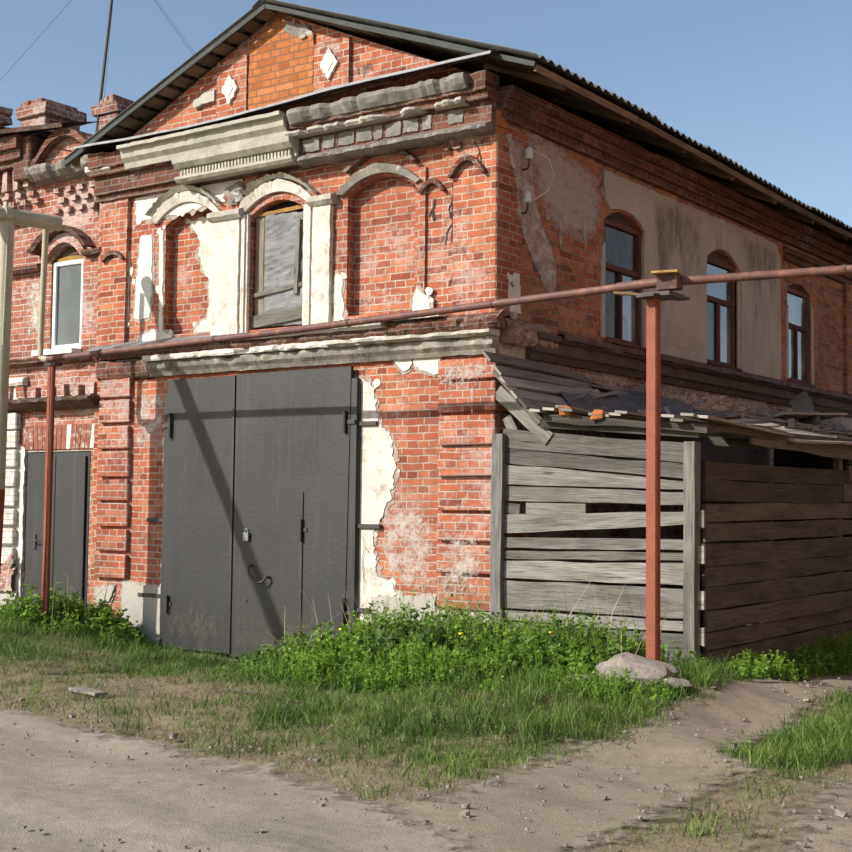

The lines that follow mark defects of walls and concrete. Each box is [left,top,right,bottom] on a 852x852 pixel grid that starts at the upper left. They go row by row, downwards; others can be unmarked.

peeling [127,179,244,342]
peeling [331,269,349,322]
peeling [409,284,434,311]
spalling [507,272,521,320]
peeling [505,133,599,293]
peeling [358,374,404,624]